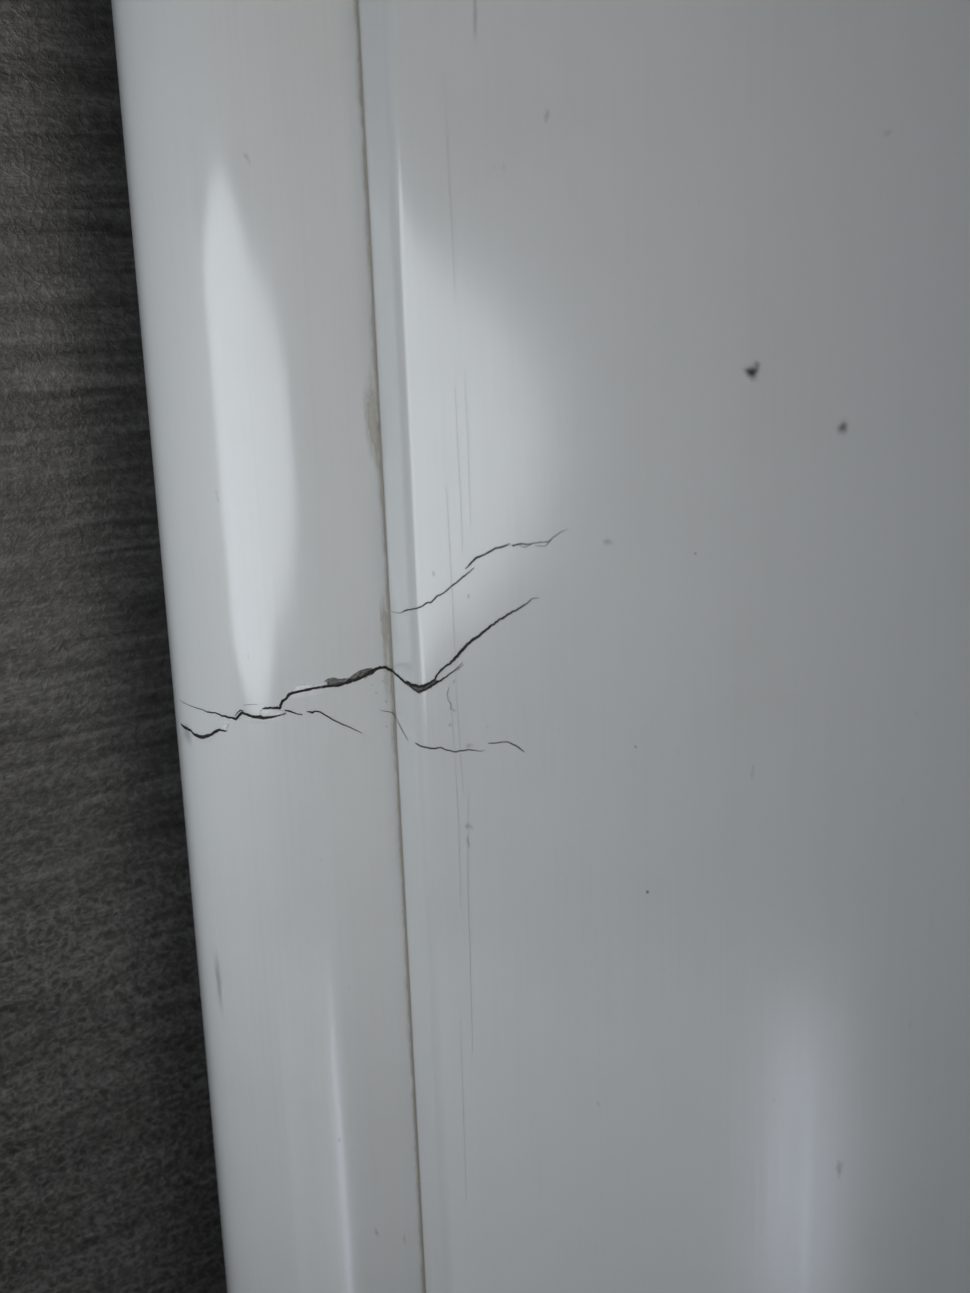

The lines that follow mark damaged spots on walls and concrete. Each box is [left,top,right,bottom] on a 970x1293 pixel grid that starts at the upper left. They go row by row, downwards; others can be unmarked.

crack [391,529,568,614]
crack [180,598,535,753]